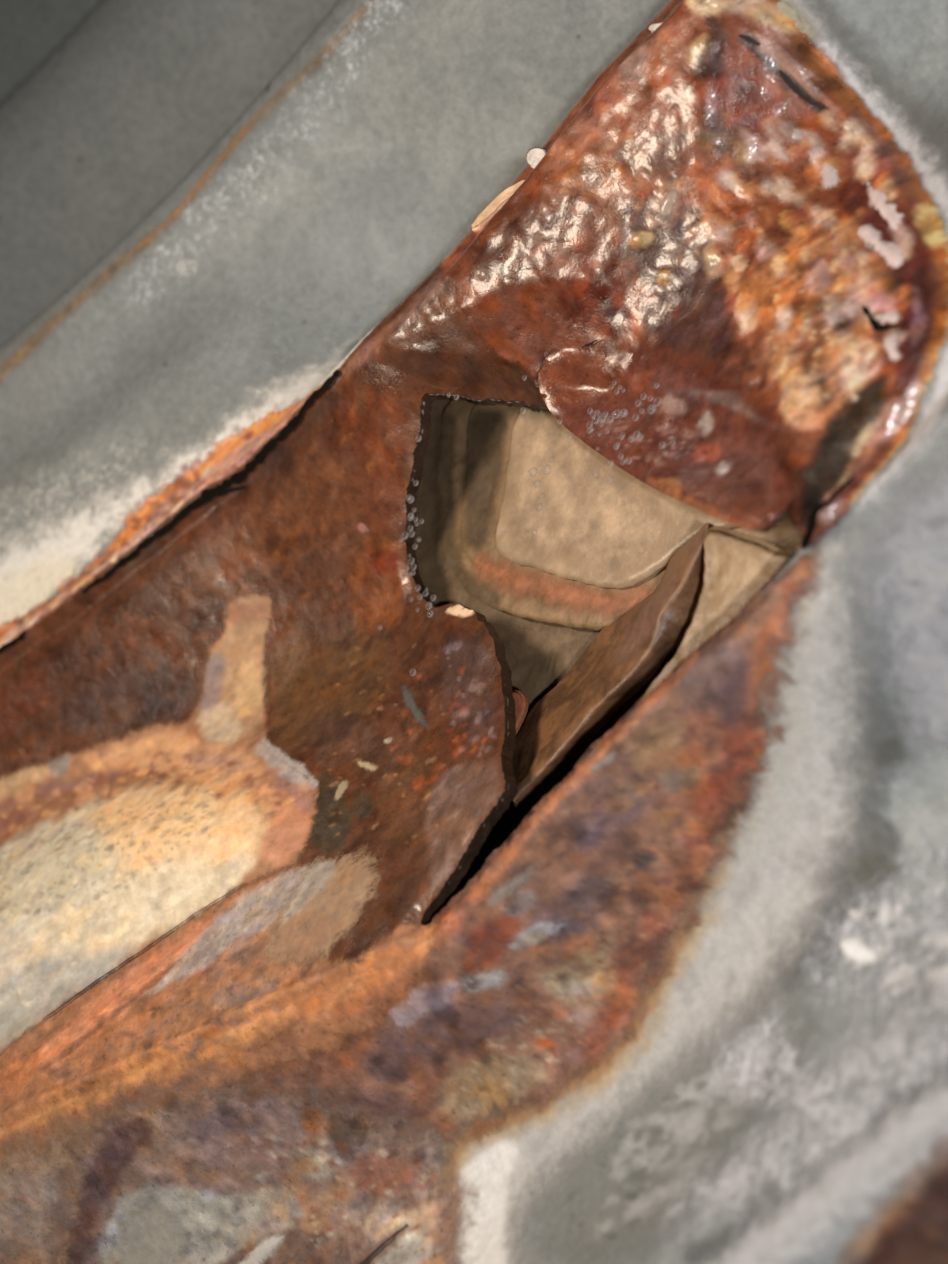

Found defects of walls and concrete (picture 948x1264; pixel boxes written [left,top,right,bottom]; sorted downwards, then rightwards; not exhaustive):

rust [471,179,526,232]
water stain [776,0,948,237]
water stain [0,323,379,632]
crack [82,370,339,593]
crack [0,630,26,653]
rust [0,258,816,1264]
water stain [435,334,948,1264]
rust [839,1139,948,1264]